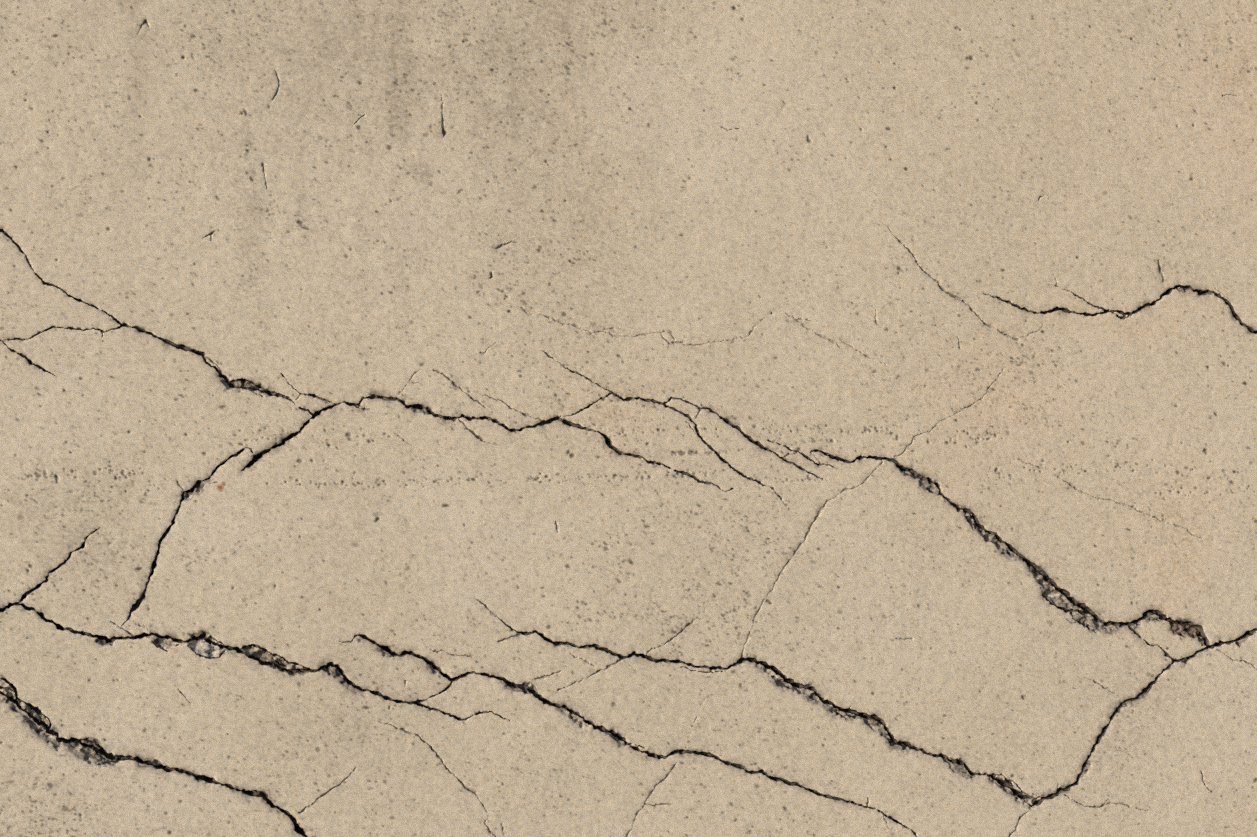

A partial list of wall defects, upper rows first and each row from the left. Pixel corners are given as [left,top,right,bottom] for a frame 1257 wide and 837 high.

crack [0,227,1257,837]